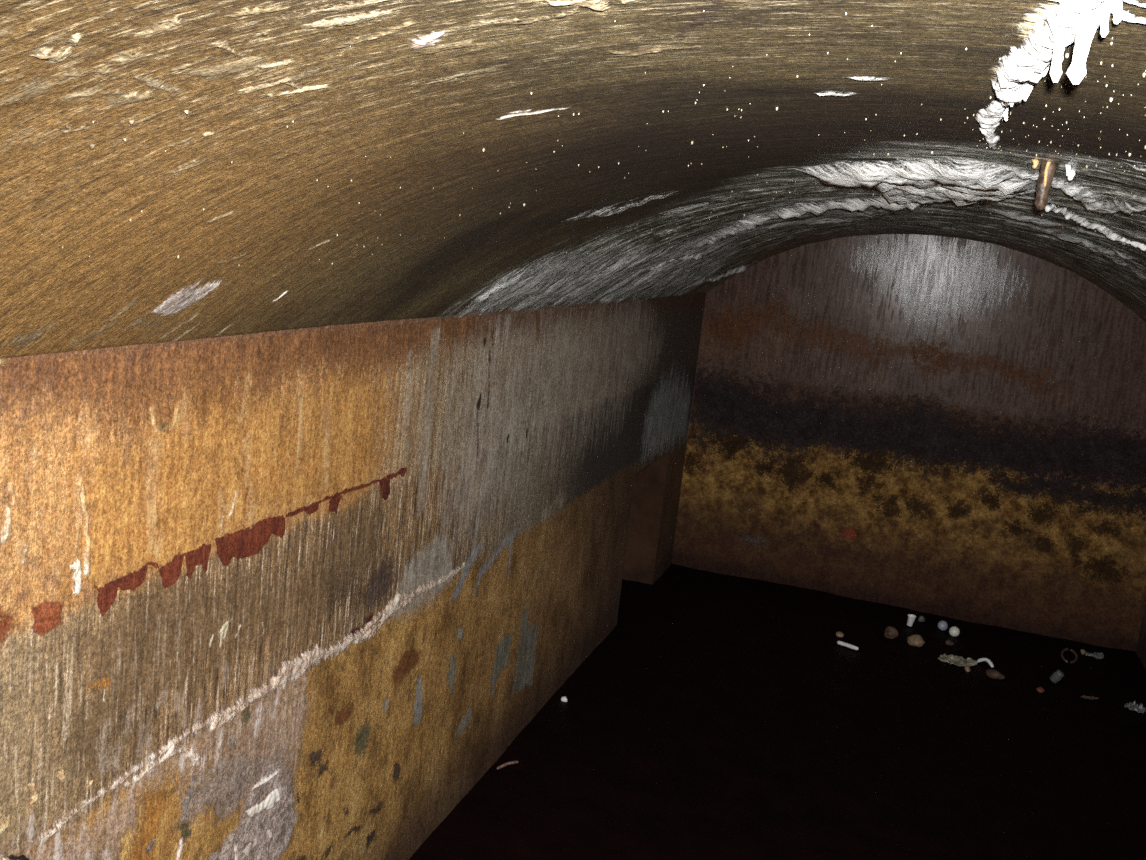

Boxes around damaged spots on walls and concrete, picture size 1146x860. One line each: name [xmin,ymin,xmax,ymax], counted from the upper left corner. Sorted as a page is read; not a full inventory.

water stain [4,0,1146,621]
rust [32,371,407,636]
rust [0,608,13,646]
water stain [490,605,538,697]
water stain [0,669,328,860]
water stain [354,722,371,755]
crack [2,852,29,860]
water stain [322,802,382,859]